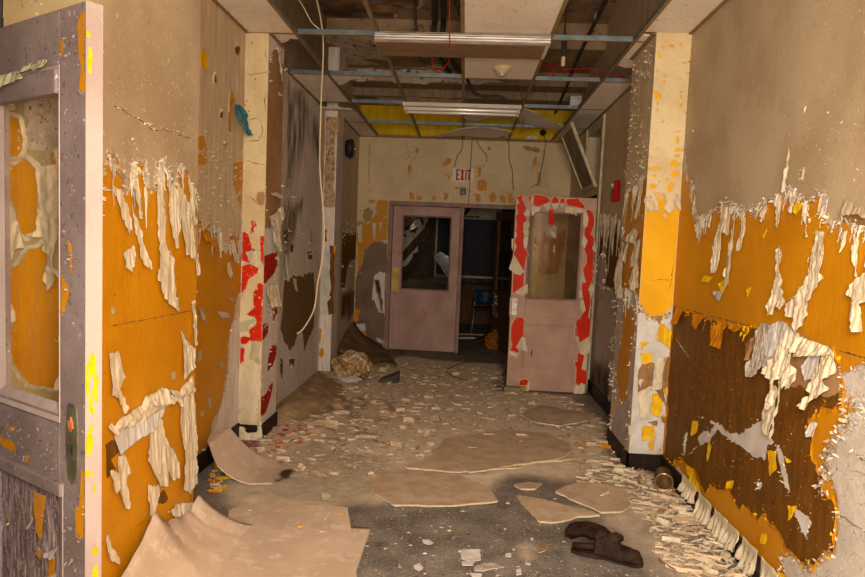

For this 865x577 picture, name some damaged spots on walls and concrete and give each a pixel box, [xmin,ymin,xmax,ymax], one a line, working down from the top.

spalling [318,0,423,20]
crack [113,105,194,160]
peeling [0,12,395,577]